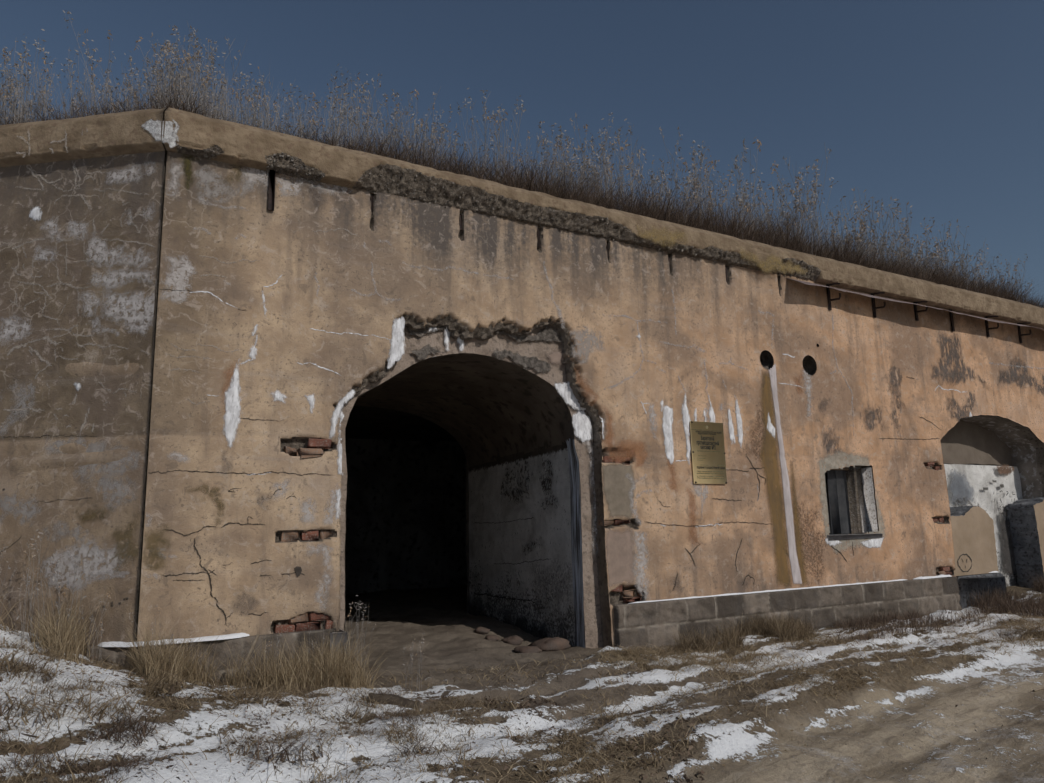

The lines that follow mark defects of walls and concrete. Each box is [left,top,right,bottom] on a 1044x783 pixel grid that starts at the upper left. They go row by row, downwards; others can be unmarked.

spalling [353,163,821,281]
crack [3,130,152,438]
spalling [280,437,337,458]
spalling [333,315,646,605]
peeling [983,465,1014,490]
spalling [932,516,950,524]
spalling [275,529,337,543]
crack [163,516,304,621]
spalling [270,611,336,634]